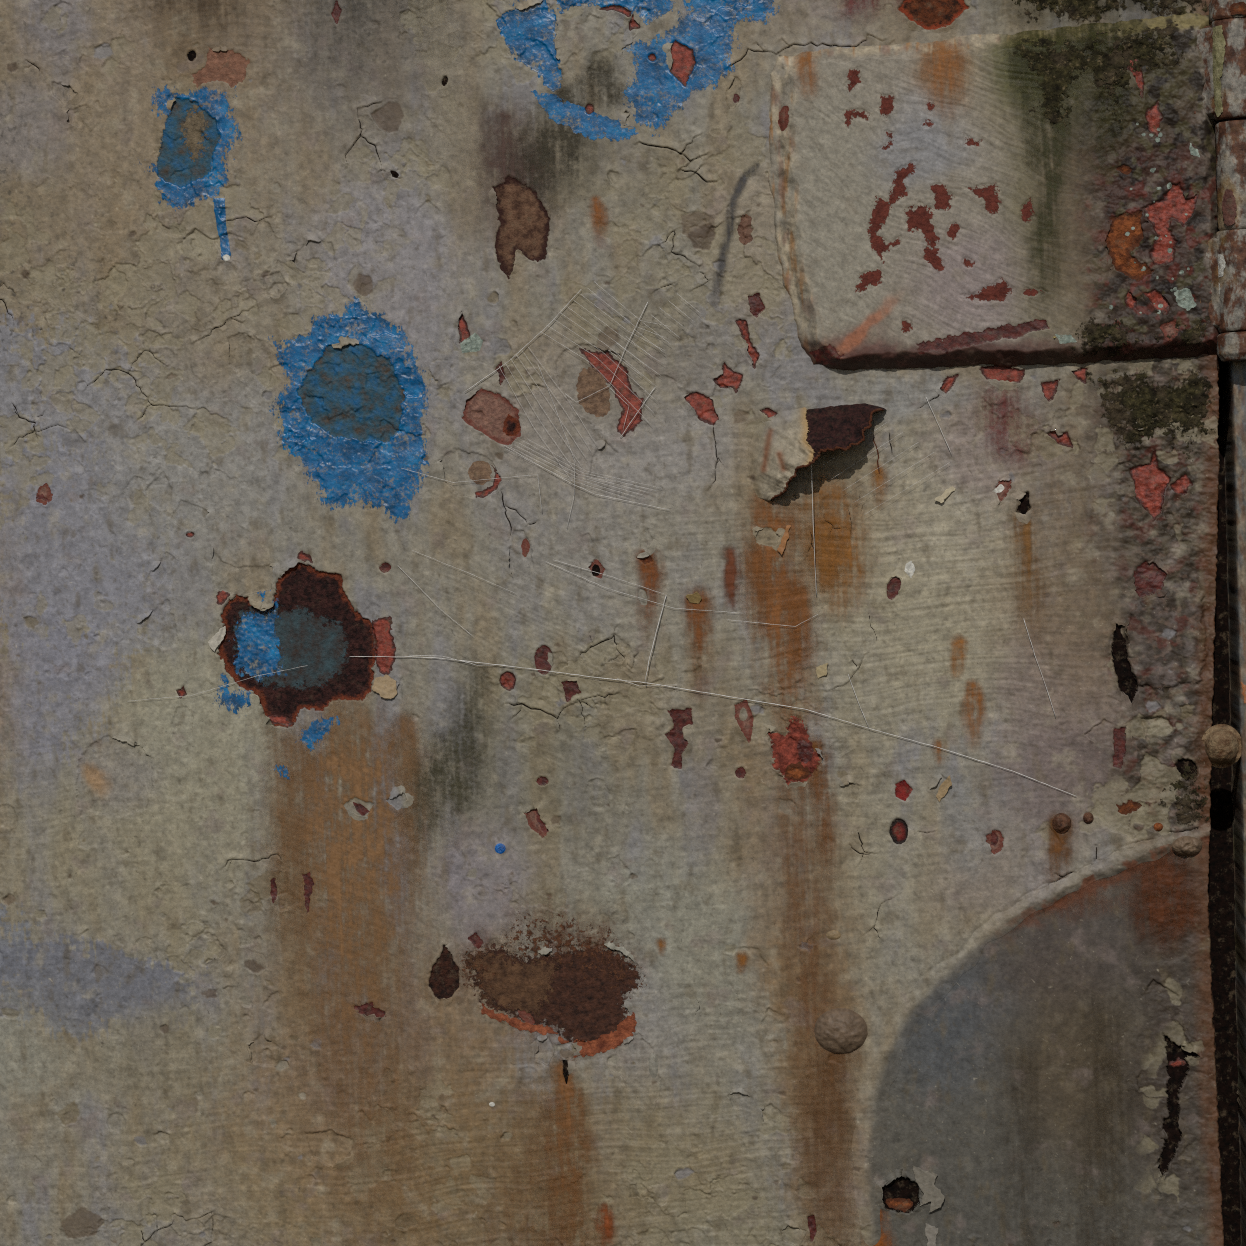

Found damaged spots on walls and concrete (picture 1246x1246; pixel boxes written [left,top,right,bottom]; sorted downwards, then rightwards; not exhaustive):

crack [642,141,707,182]
spalling [488,175,550,279]
crack [12,403,60,445]
crack [87,350,175,418]
rust [805,486,862,595]
peeling [208,626,226,652]
rust [724,499,810,721]
peeling [1111,557,1207,712]
peeling [372,675,403,699]
rust [429,911,647,1241]
crack [141,1212,213,1246]
peeling [874,1166,945,1246]